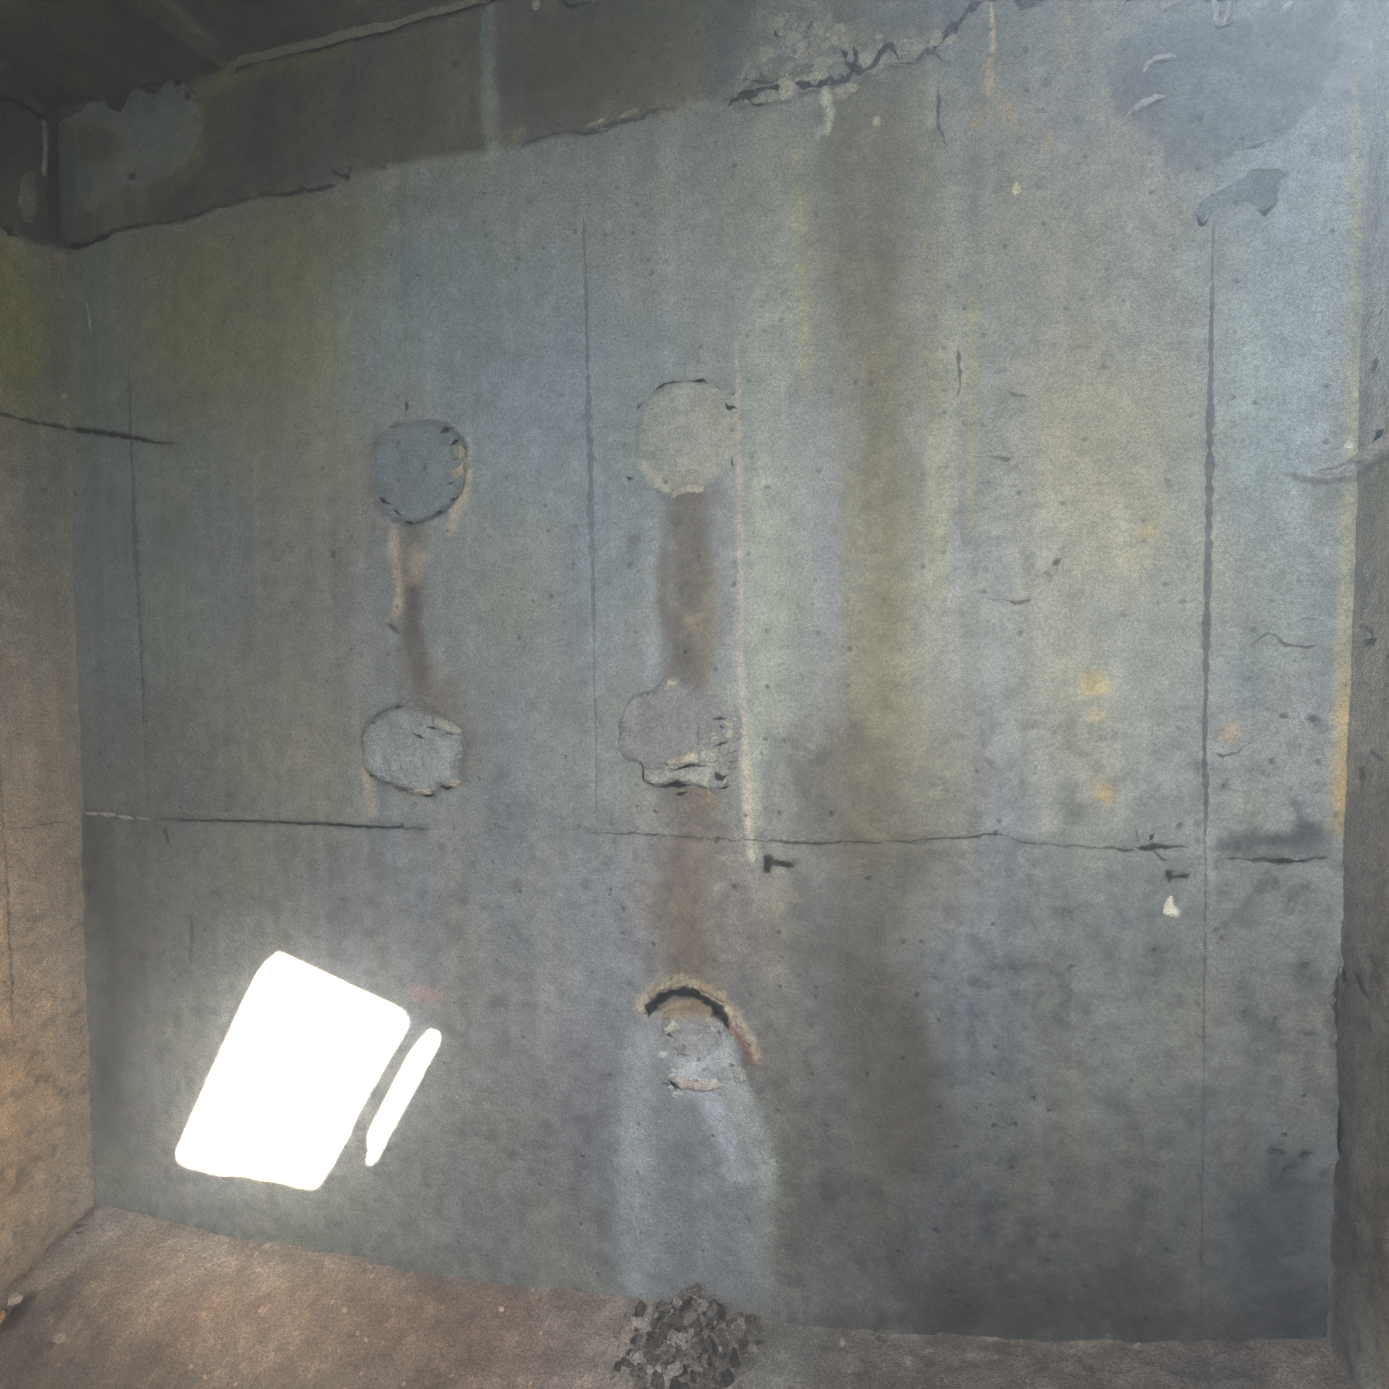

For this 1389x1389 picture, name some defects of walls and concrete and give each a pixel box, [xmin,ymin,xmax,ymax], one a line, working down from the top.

spalling [711,0,949,114]
crack [899,0,1071,148]
crack [1122,0,1235,30]
water stain [1105,0,1352,181]
corrosion [1337,68,1369,462]
crack [0,382,177,776]
water stain [627,0,1220,1207]
corrosion [1322,483,1358,842]